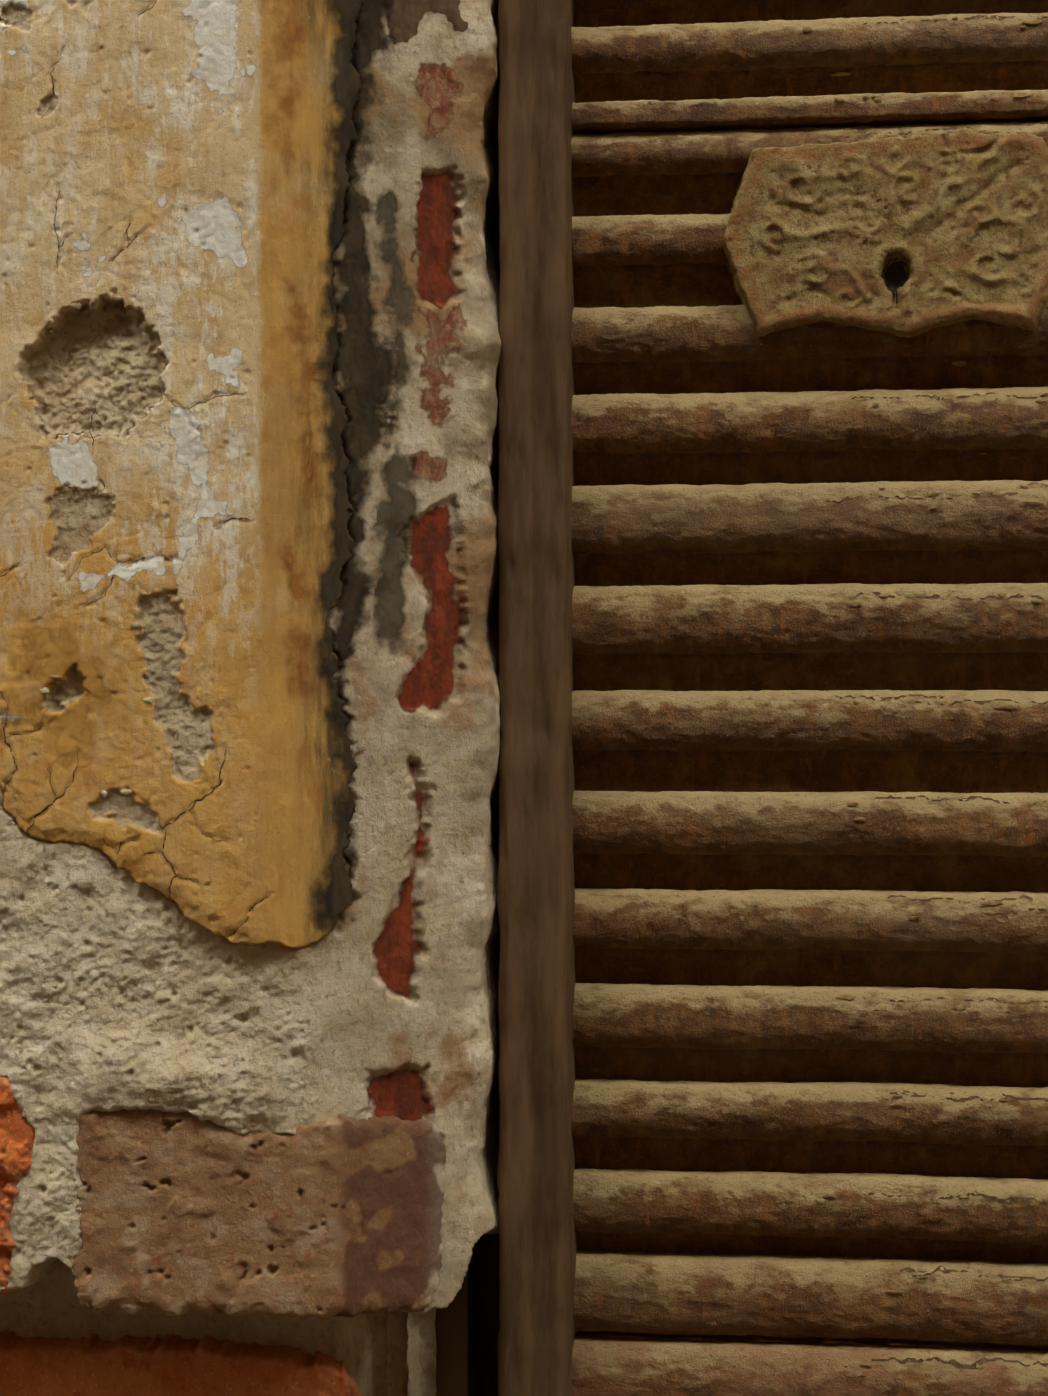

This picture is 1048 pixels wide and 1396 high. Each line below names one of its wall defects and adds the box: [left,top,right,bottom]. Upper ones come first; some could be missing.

spalling [416,63,463,140]
spalling [20,294,228,782]
peeling [206,348,243,393]
damp [331,0,416,730]
spalling [409,451,447,481]
spalling [398,505,464,713]
spalling [415,170,467,424]
spalling [88,789,162,835]
damp [343,848,358,877]
spalling [373,763,429,997]